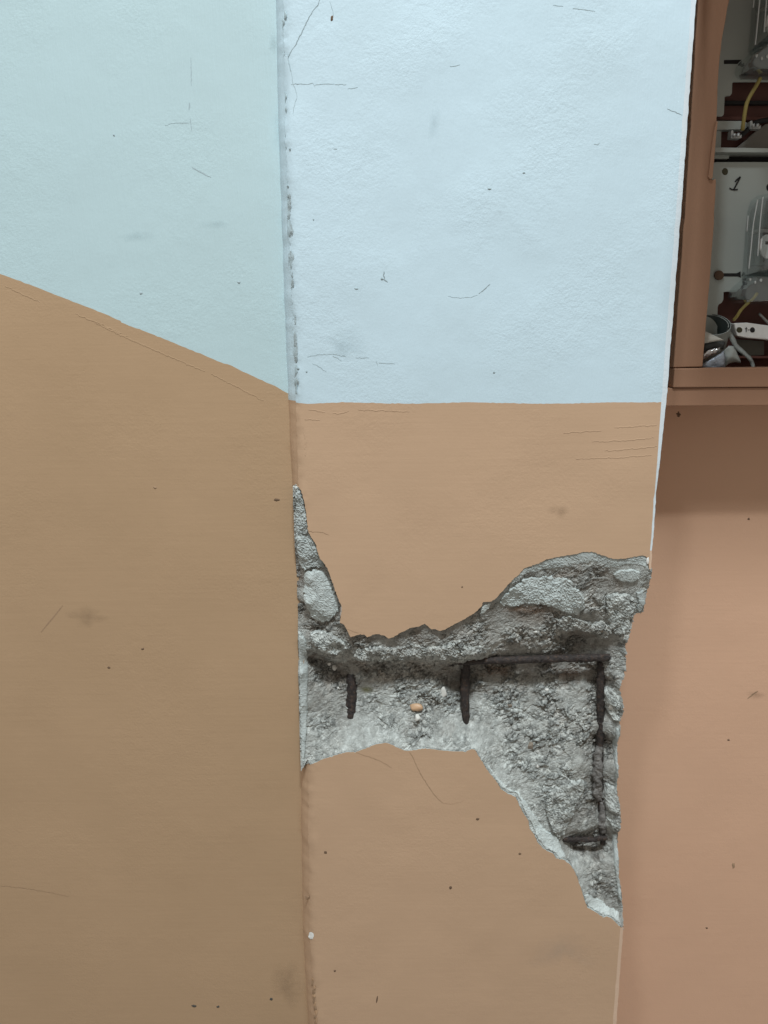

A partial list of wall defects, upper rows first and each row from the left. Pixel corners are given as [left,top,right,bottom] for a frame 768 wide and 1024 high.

spalling [293,484,652,930]